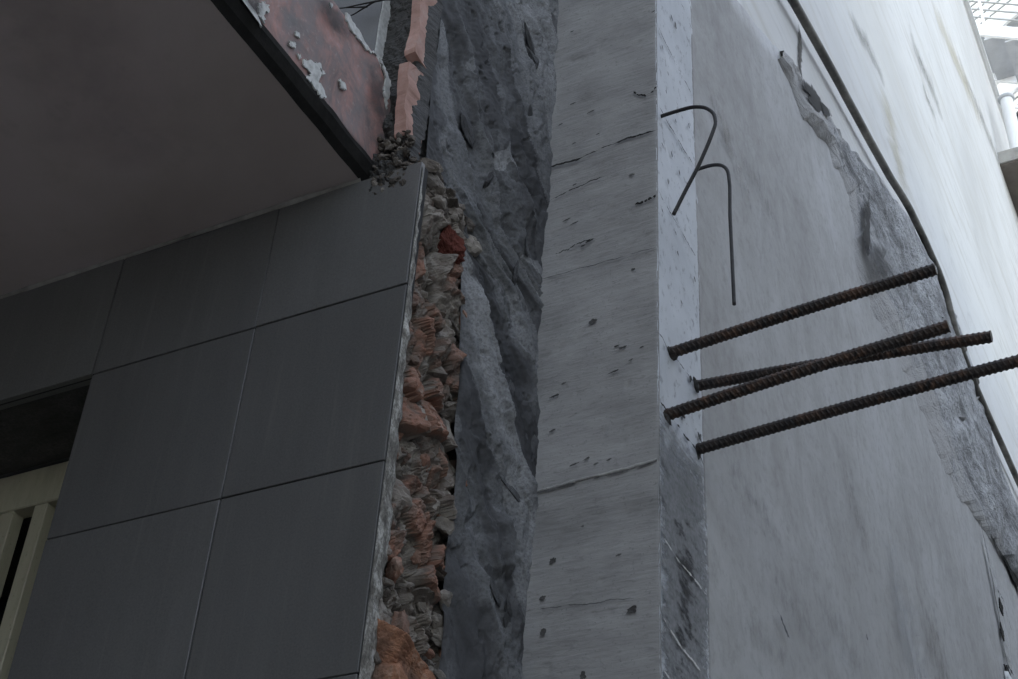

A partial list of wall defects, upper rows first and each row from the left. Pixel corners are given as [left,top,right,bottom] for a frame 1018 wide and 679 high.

peeling [243,0,270,28]
peeling [288,31,327,99]
peeling [524,21,539,69]
spalling [345,0,483,679]
spalling [663,51,1018,586]
peeling [484,564,513,628]